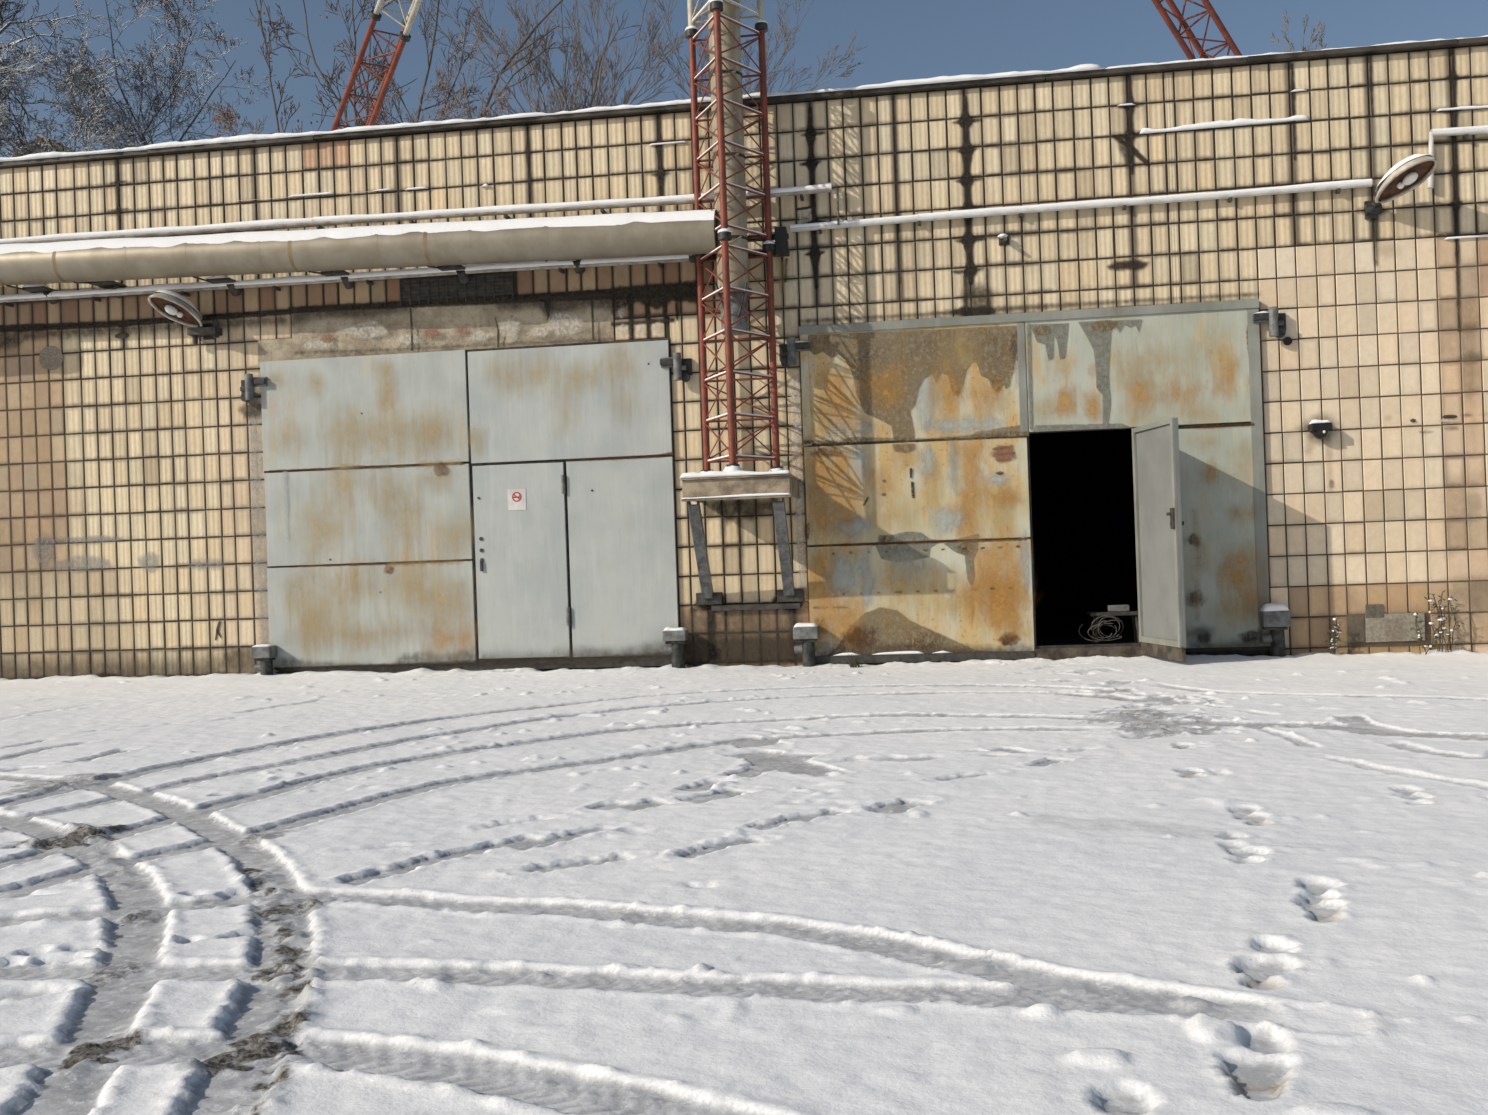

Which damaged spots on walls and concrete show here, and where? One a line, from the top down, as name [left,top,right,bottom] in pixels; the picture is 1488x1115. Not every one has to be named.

damp [1113,74,1150,174]
damp [110,159,126,229]
damp [0,318,184,348]
damp [201,281,698,354]
damp [277,95,1160,670]
corrosion [1057,392,1097,416]
corrosion [270,452,672,476]
damp [0,387,268,679]
corrosion [285,559,470,577]
corrosion [804,445,1026,645]